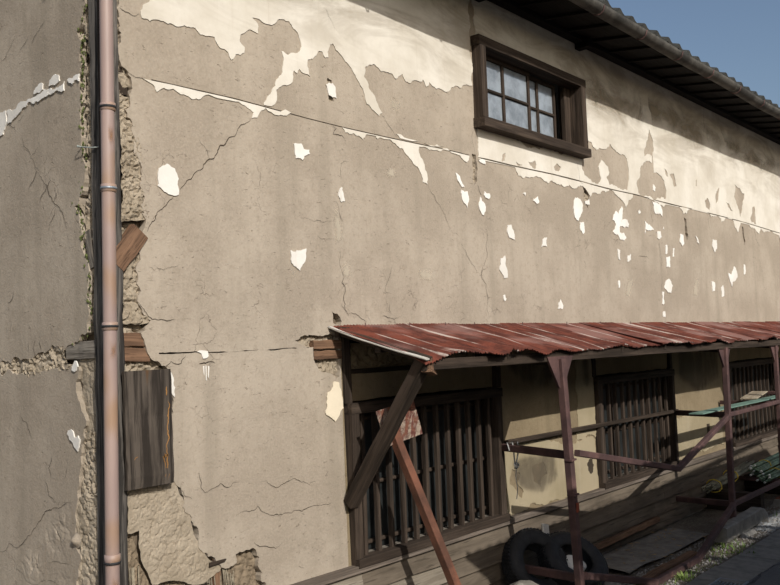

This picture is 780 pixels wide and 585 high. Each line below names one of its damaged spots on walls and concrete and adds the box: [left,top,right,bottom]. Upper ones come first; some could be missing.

crack [10,117,67,229]
spalling [0,16,93,244]
spalling [118,65,149,234]
flaking render [140,0,780,267]
leakage [590,88,709,142]
spalling [122,254,149,333]
flaking render [290,249,306,271]
flaking render [499,256,508,278]
flaking render [662,279,673,317]
flaking render [711,264,746,297]
spalling [125,361,161,371]
flaking render [296,335,343,421]